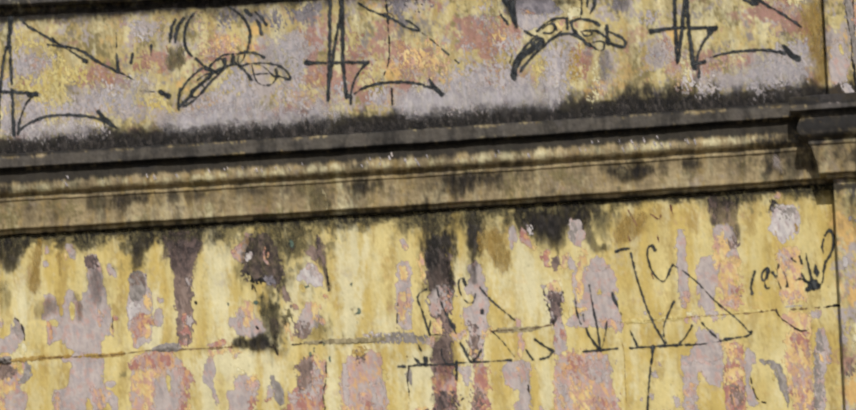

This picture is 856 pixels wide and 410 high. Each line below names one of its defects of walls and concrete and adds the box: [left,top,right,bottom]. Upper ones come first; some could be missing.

leakage [0,0,828,154]
leakage [447,171,494,195]
leakage [613,164,654,180]
leakage [0,184,834,292]
peeling [41,229,493,410]
leakage [260,295,279,339]
crack [493,304,555,332]
peeling [673,192,832,410]
peeling [0,317,33,410]
crack [38,350,152,359]
crack [179,344,232,352]